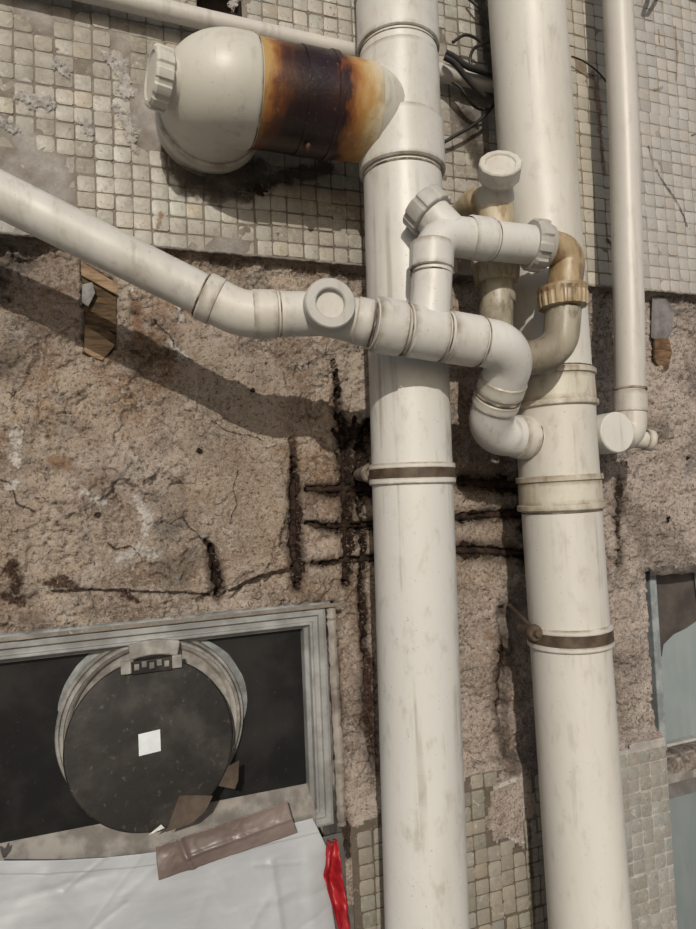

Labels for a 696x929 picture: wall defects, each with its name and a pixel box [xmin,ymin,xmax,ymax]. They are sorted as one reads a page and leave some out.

damp [162,148,334,203]
spalling [450,275,480,315]
spalling [588,286,614,415]
spalling [0,234,381,906]
corrosion [288,436,374,580]
corrosion [454,510,521,521]
corrosion [456,546,524,556]
flaking render [449,364,538,850]
spalling [599,291,696,751]
corrosion [360,645,378,758]
corrosion [493,635,509,712]